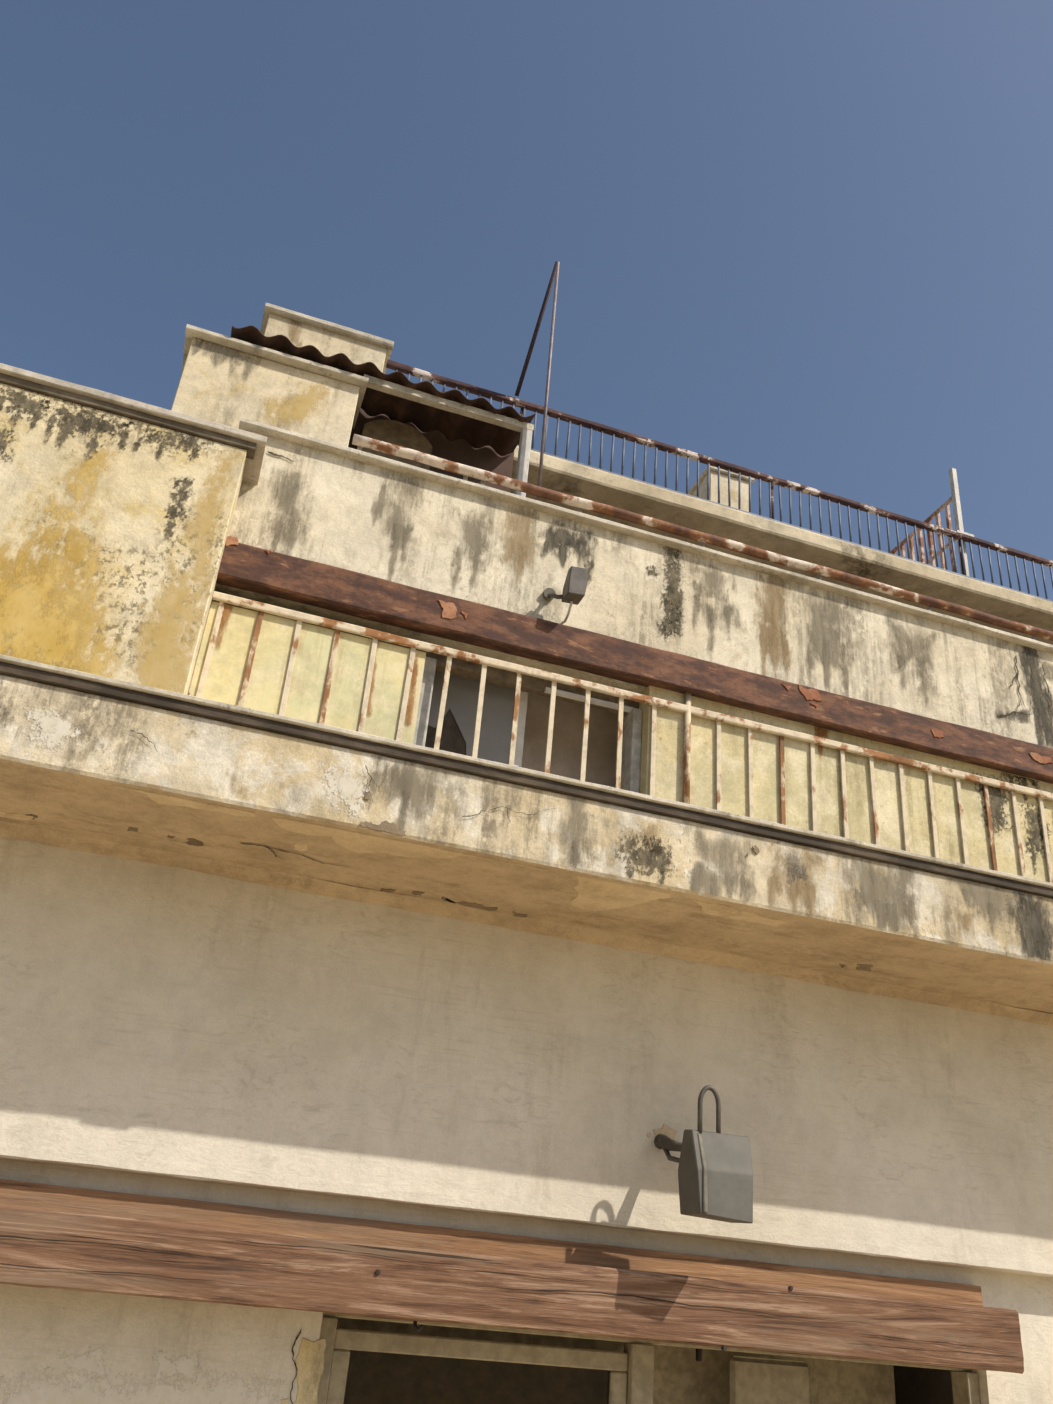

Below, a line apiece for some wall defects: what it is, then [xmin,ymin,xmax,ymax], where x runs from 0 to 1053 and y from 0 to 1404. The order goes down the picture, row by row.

damp [0,386,237,693]
damp [500,511,597,581]
damp [646,545,739,651]
corrosion [781,683,822,708]
crack [996,656,1053,717]
damp [997,646,1053,746]
corrosion [815,727,828,756]
corrosion [1029,752,1053,764]
mould [615,834,675,885]
mould [973,772,1052,875]
damp [952,878,1053,961]
crack [290,1330,301,1404]